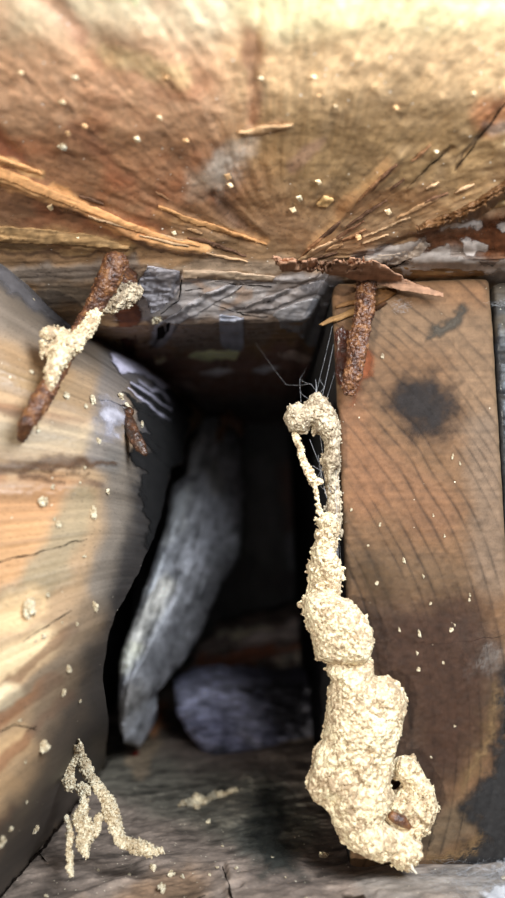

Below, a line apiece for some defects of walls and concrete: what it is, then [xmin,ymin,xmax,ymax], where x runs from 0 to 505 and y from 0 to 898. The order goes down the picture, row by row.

corrosion [114,296,142,357]
corrosion [334,326,349,385]
water stain [388,380,459,436]
crack [0,539,86,562]